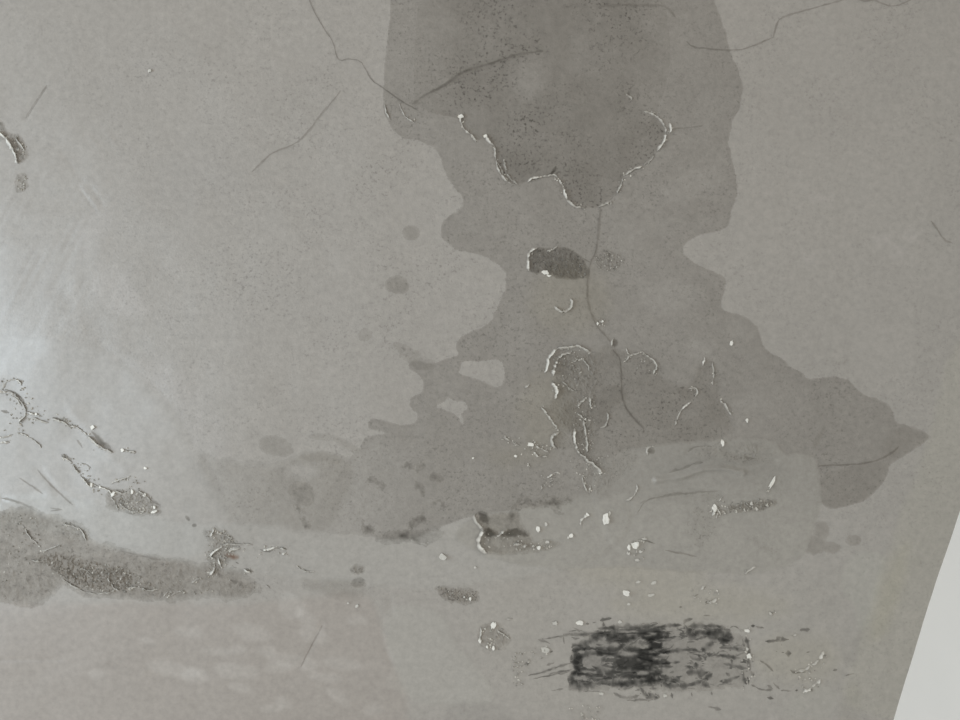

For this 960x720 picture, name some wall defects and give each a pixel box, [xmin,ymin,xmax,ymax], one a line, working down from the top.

spalling [0,120,29,193]
crack [309,0,543,123]
peeling [414,0,673,210]
crack [686,0,911,51]
damp [197,0,929,547]
spalling [526,245,623,280]
crack [583,208,644,432]
peeling [501,343,748,498]
peeling [61,454,162,518]
spalling [0,504,287,609]
spalling [471,510,573,556]
damp [805,521,861,556]